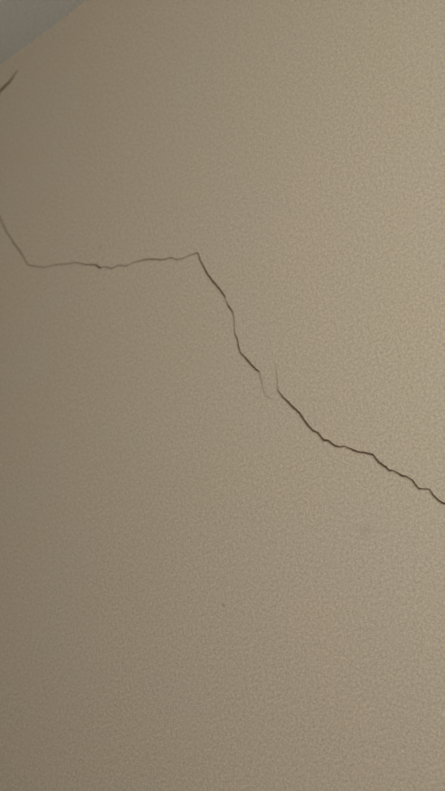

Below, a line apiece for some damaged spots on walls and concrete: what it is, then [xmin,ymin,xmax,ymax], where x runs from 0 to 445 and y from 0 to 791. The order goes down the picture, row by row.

crack [0,70,18,94]
crack [0,214,445,506]